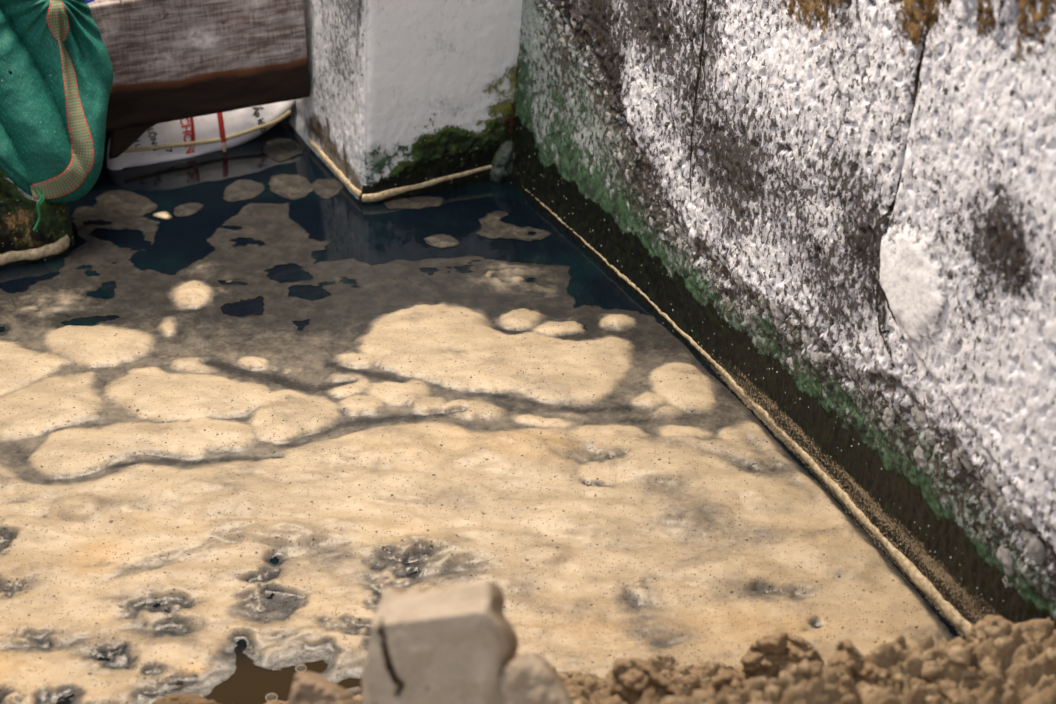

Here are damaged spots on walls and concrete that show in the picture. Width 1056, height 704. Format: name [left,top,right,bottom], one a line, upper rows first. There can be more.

water stain [0,211,72,268]
crack [684,0,715,200]
water stain [688,91,794,222]
rust [779,0,853,59]
crack [871,0,945,353]
rust [883,0,957,126]
rust [976,0,1056,72]
water stain [306,114,1056,644]